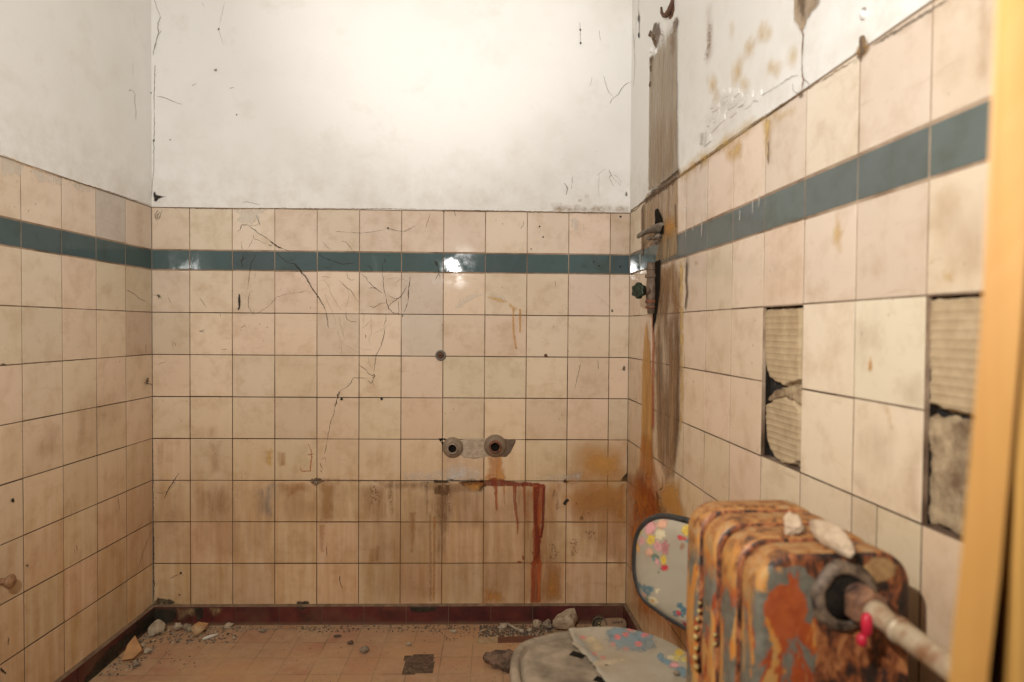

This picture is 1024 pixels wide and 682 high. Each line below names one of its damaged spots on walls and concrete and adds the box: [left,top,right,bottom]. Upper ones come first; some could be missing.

crack [873,0,947,45]
crack [4,0,853,214]
flaking render [648,18,678,190]
water stain [410,590,436,613]
rust [463,457,550,603]
water stain [553,453,621,520]
rust [630,471,683,544]
peeling [764,305,803,468]
peeling [927,294,982,537]